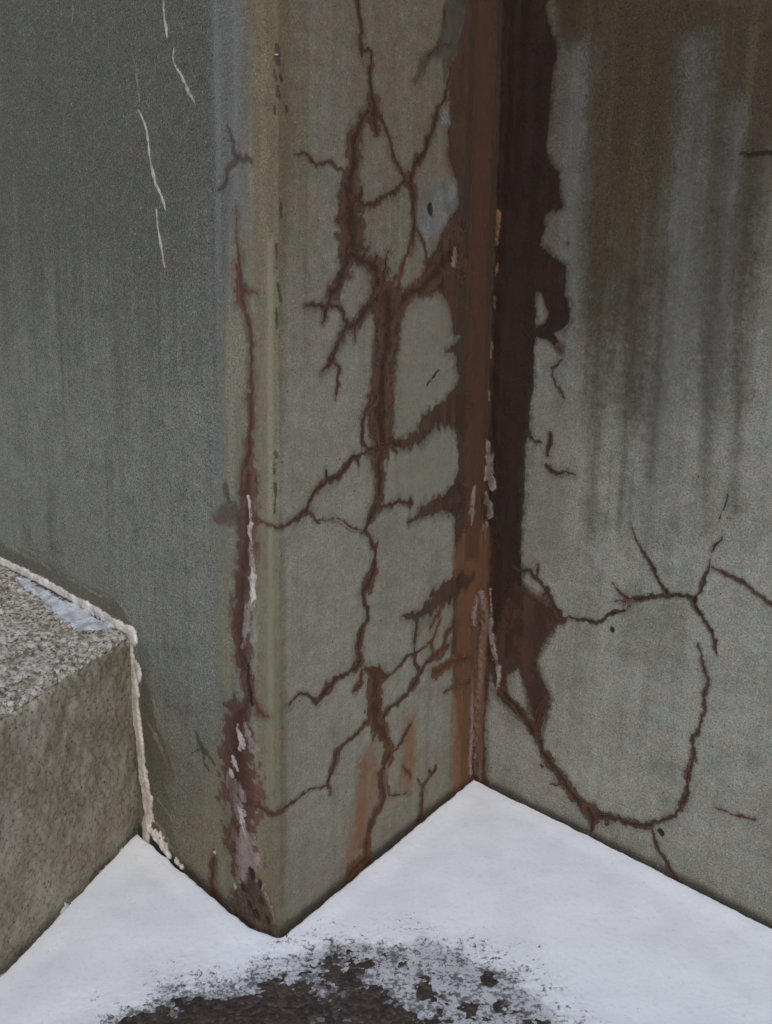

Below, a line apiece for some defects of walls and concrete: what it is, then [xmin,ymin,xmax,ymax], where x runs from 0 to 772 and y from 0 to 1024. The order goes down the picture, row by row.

crack [163,0,195,103]
crack [138,110,166,268]
crack [195,0,469,882]
corrosion [391,0,571,791]
leakage [470,440,496,537]
leakage [469,589,501,782]
crack [498,494,772,882]
spalling [228,867,278,938]